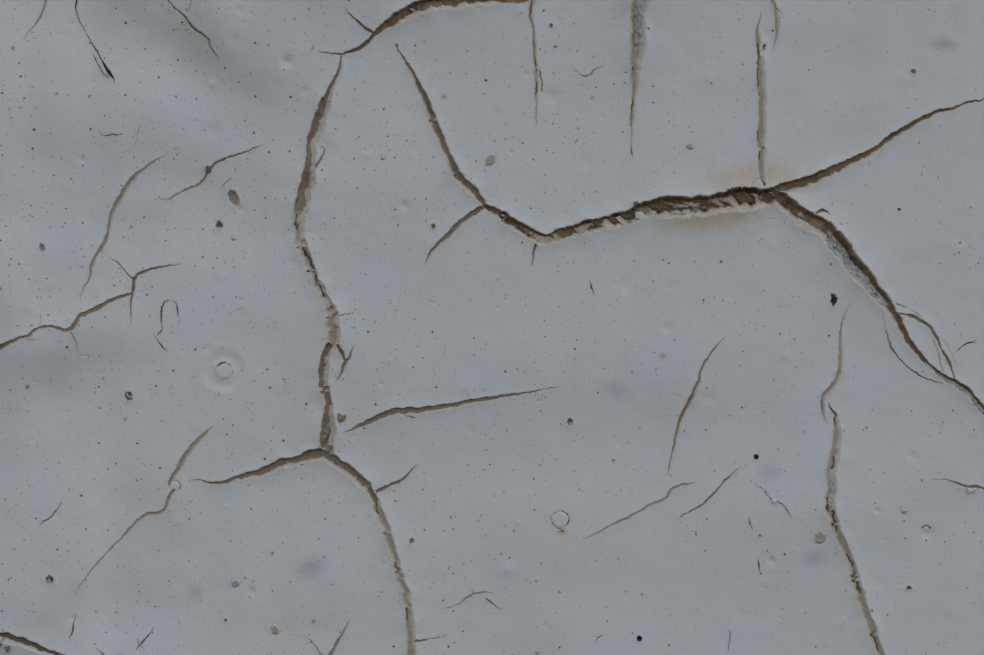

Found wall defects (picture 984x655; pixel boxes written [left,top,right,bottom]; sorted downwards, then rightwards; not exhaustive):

crack [20,0,118,89]
crack [0,150,186,355]
crack [73,0,568,655]
crack [392,0,984,422]
crack [578,334,796,578]
crack [818,301,888,655]
crack [0,610,80,655]